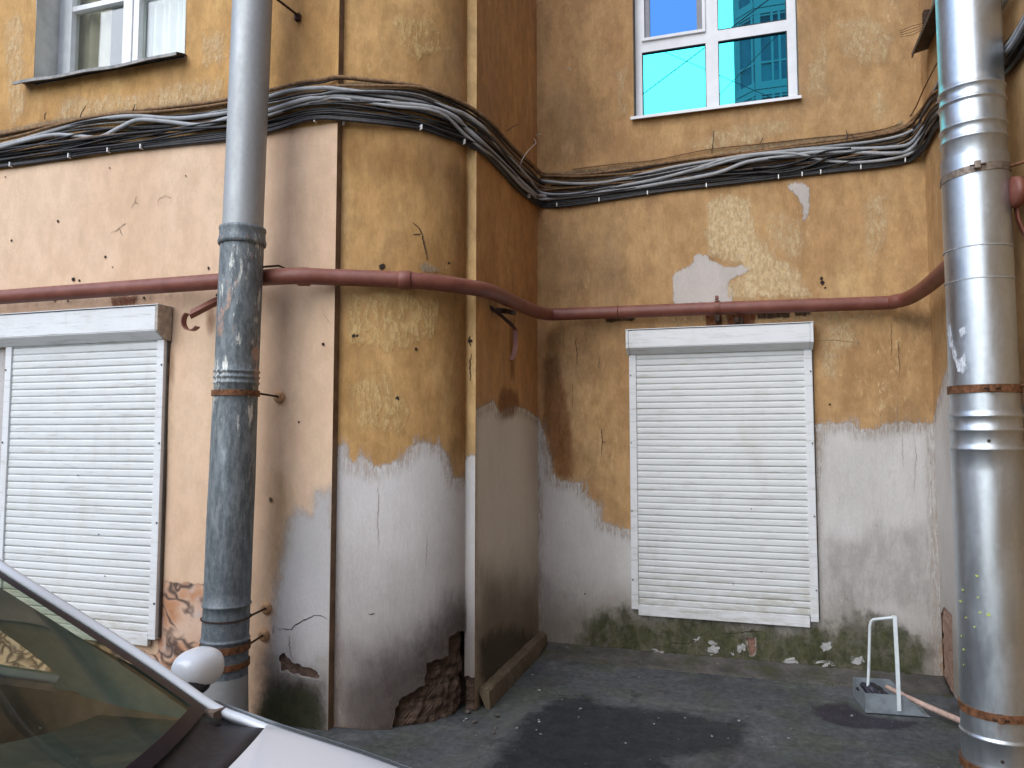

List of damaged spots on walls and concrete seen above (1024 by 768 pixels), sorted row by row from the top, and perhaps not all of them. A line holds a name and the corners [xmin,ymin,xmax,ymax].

peeling [661,182,810,323]
peeling [265,368,959,730]